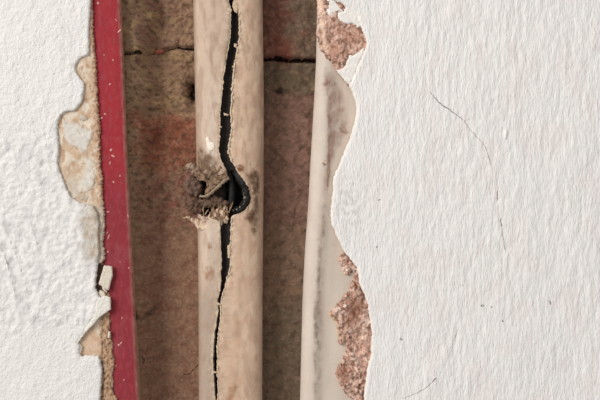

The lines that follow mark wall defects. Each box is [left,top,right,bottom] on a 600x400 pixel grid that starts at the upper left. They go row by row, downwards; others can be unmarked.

spalling [316,0,367,86]
flaking render [58,0,122,400]
crack [431,93,490,160]
spalling [328,253,372,400]